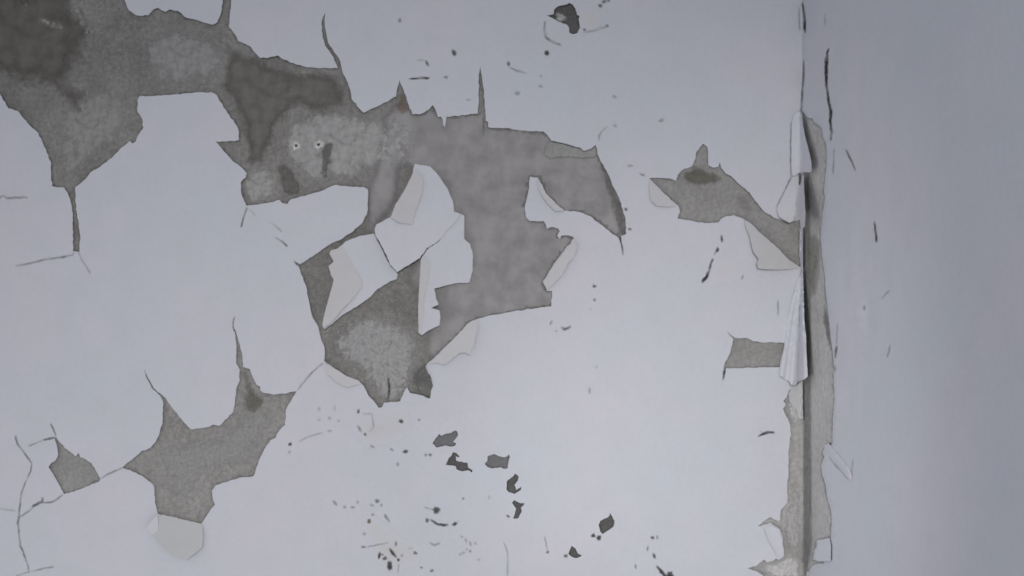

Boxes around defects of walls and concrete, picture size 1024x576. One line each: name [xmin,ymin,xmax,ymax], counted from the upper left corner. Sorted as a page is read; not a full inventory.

peeling [0,0,626,408]
peeling [649,112,835,576]
peeling [49,438,100,494]
peeling [123,326,297,560]
peeling [433,431,473,472]
peeling [485,454,525,519]
peeling [591,514,614,540]